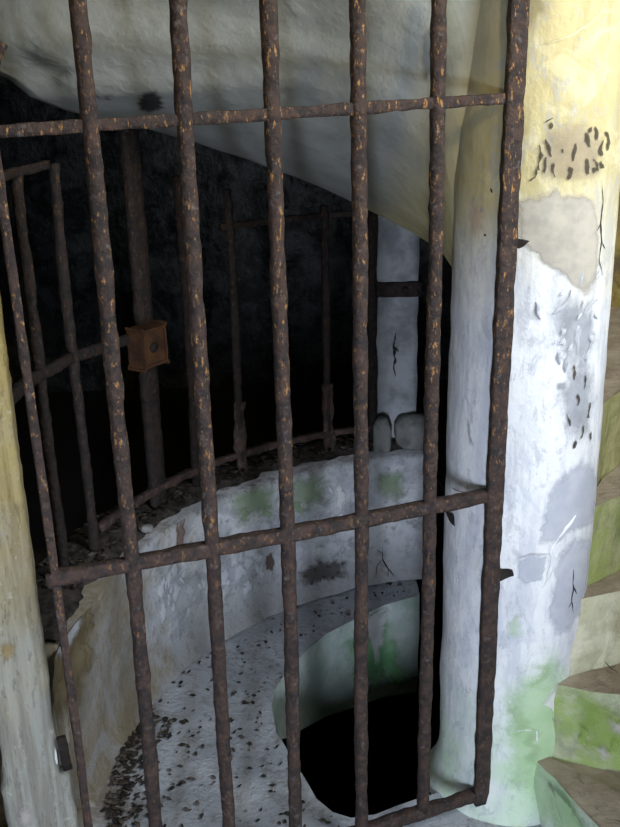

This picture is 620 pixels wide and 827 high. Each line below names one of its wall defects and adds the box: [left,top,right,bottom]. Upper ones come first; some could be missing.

peeling [530,118,610,181]
crack [597,180,605,276]
flaking render [519,191,601,449]
crack [392,333,400,375]
damp [544,690,556,718]